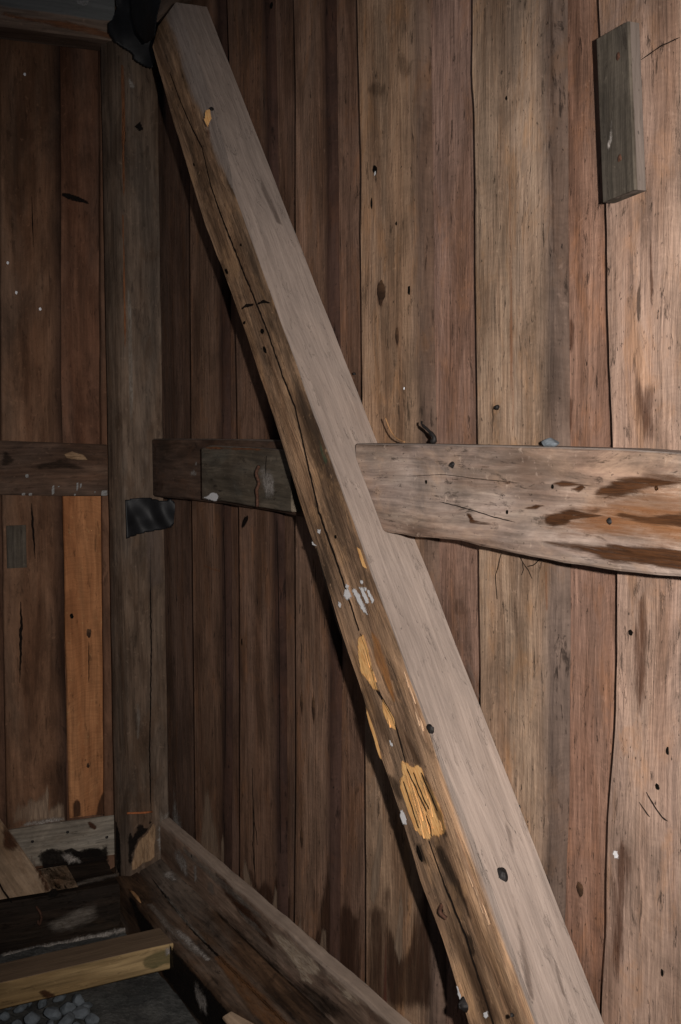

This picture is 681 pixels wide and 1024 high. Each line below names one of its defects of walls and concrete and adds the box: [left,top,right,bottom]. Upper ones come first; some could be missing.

crack [17,602,25,673]